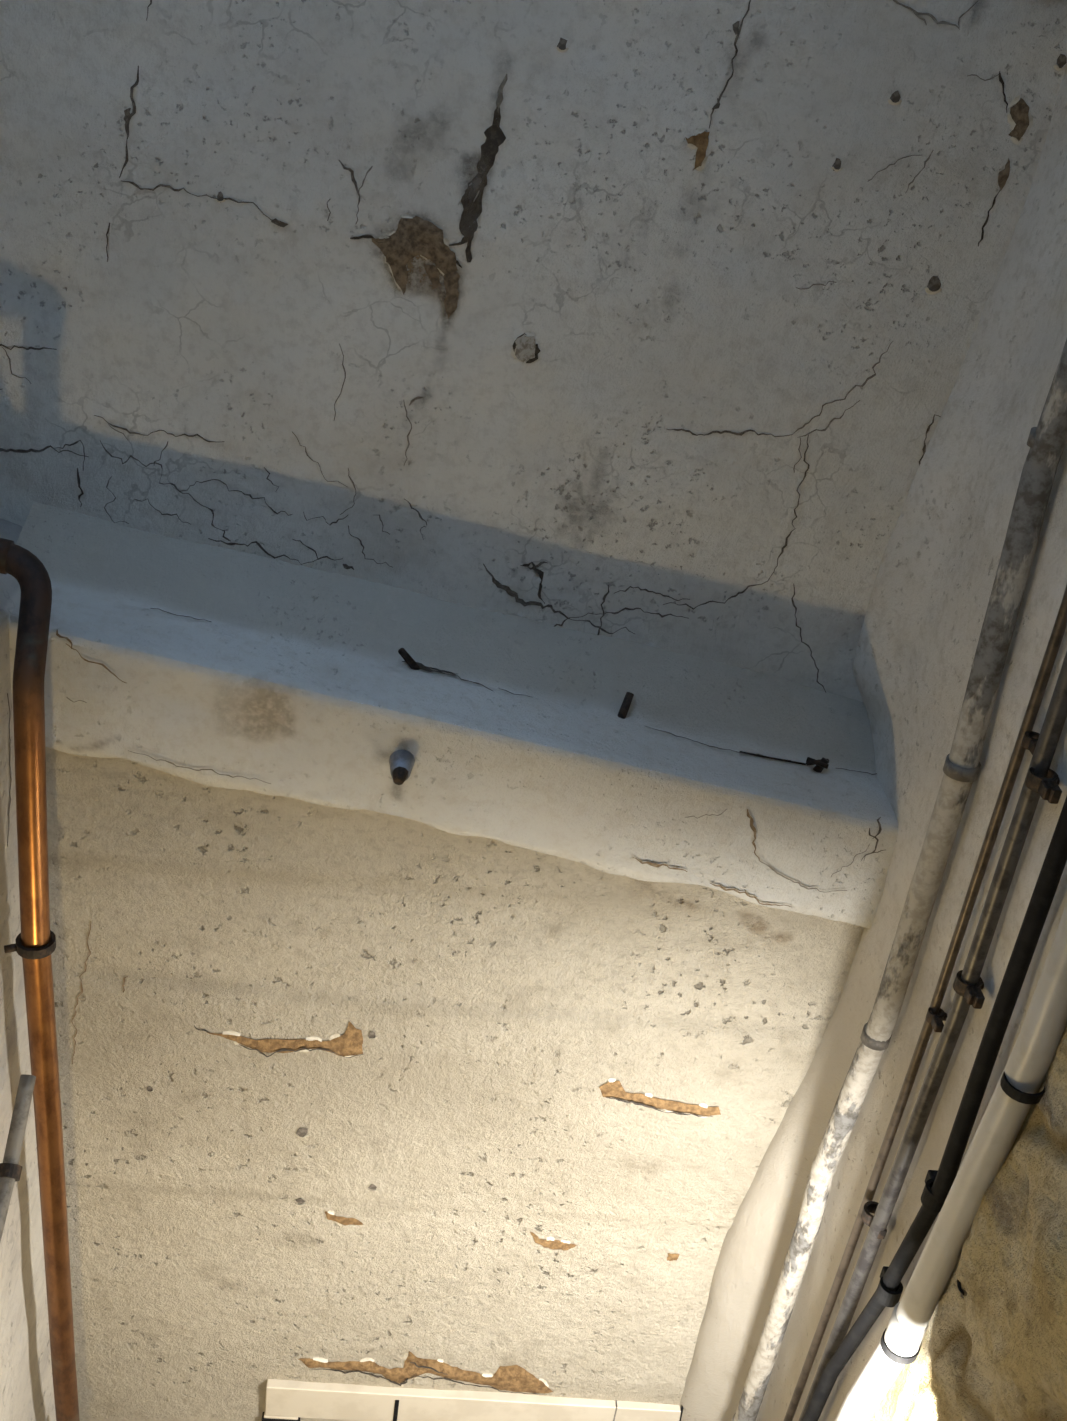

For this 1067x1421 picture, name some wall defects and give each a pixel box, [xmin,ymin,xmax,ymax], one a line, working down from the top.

crack [709,0,751,129]
crack [893,0,979,30]
crack [119,66,288,227]
crack [327,160,373,224]
crack [449,74,508,262]
peeling [686,128,710,171]
spalling [968,71,1033,247]
spalling [350,212,462,319]
crack [0,344,57,390]
crack [0,415,427,570]
crack [483,341,893,693]
crack [402,661,531,697]